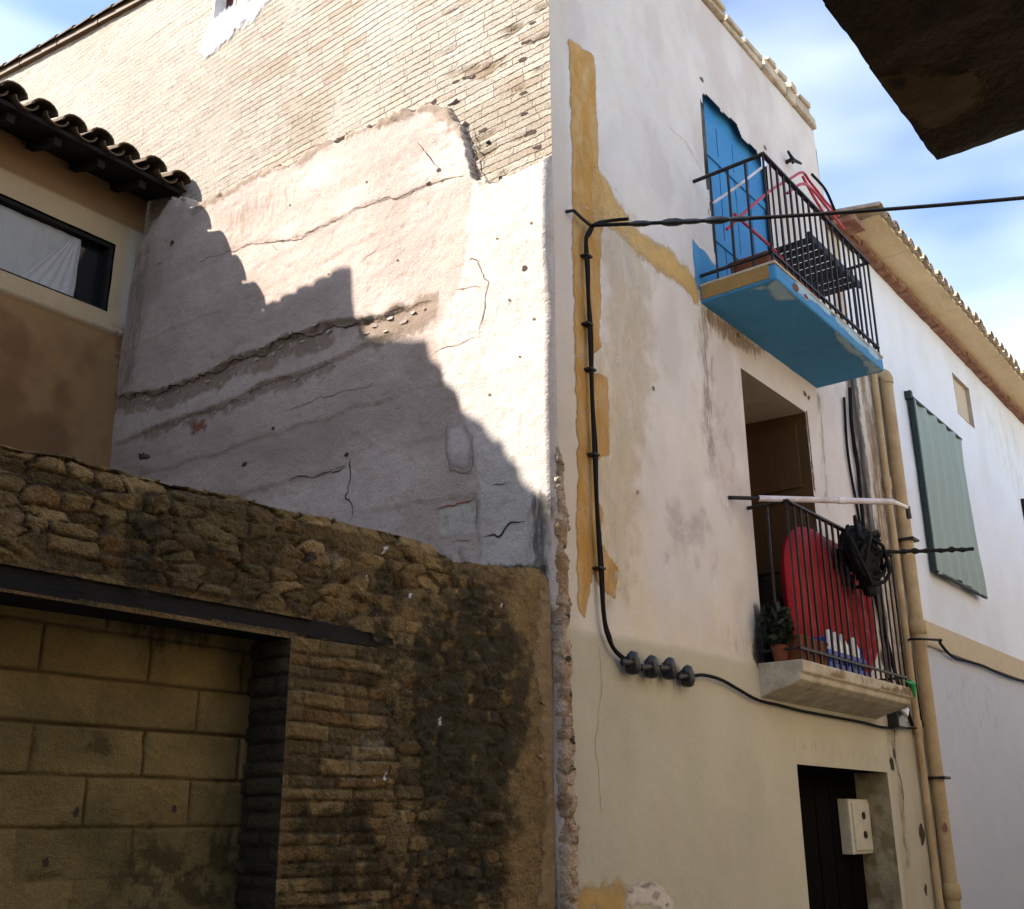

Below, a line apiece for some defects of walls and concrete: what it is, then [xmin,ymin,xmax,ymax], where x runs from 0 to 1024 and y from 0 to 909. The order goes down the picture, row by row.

crack [201,142,467,262]
peeling [193,98,491,213]
crack [433,258,489,354]
crack [290,383,372,410]
crack [292,462,353,514]
crack [453,521,526,542]
peeling [534,39,699,909]